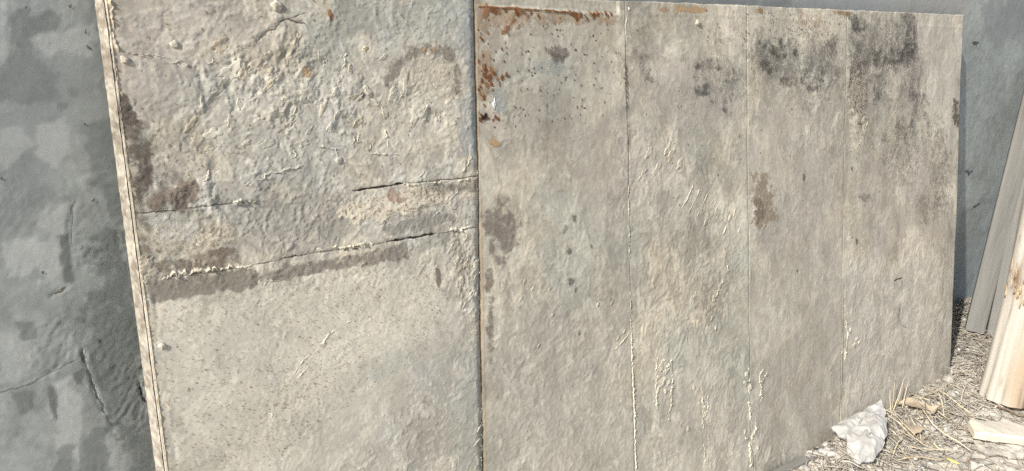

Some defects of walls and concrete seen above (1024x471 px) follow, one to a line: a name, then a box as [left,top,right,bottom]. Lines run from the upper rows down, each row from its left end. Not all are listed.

corrosion [449,3,626,147]
water stain [755,38,824,93]
water stain [848,17,917,152]
corrosion [341,187,446,220]
crack [352,176,477,191]
water stain [750,171,777,228]
crack [162,225,476,280]
water stain [147,181,521,303]